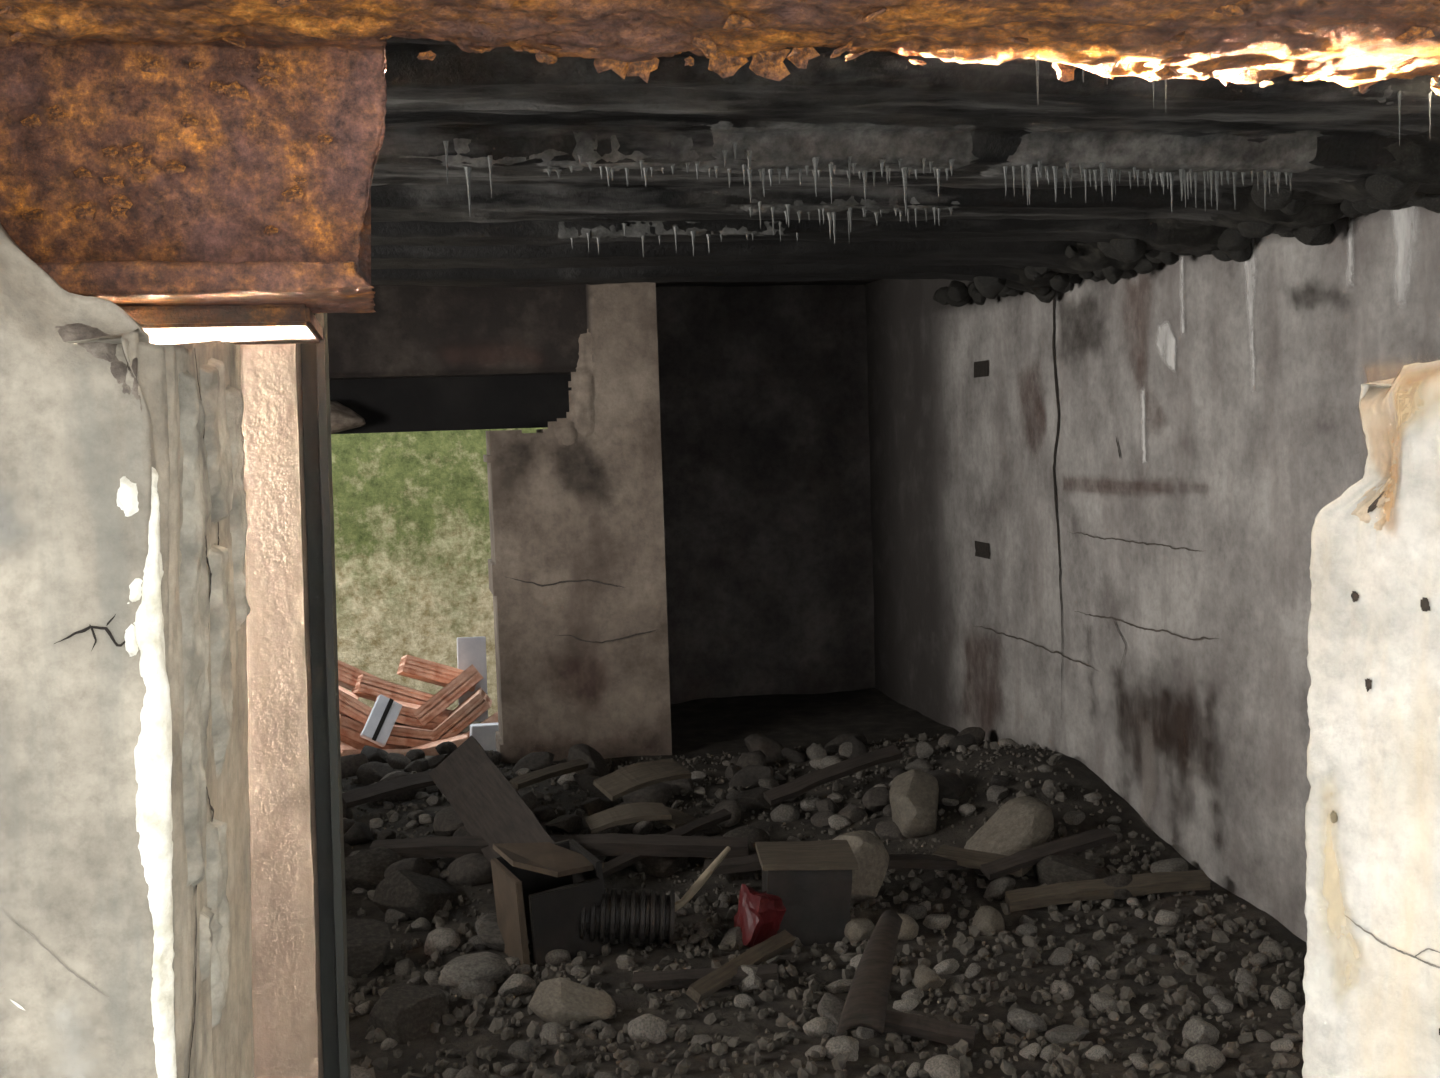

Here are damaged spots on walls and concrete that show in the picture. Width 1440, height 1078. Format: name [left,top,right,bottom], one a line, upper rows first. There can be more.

corrosion [593,57,659,83]
corrosion [675,13,868,81]
corrosion [1052,62,1077,82]
corrosion [1259,71,1339,87]
spalling [933,126,1440,307]
spalling [548,329,596,448]
crack [974,297,1219,687]
spalling [1351,478,1396,531]
crack [54,614,125,651]
water stain [1118,686,1208,788]
water stain [116,467,177,1078]
crack [1325,906,1440,968]